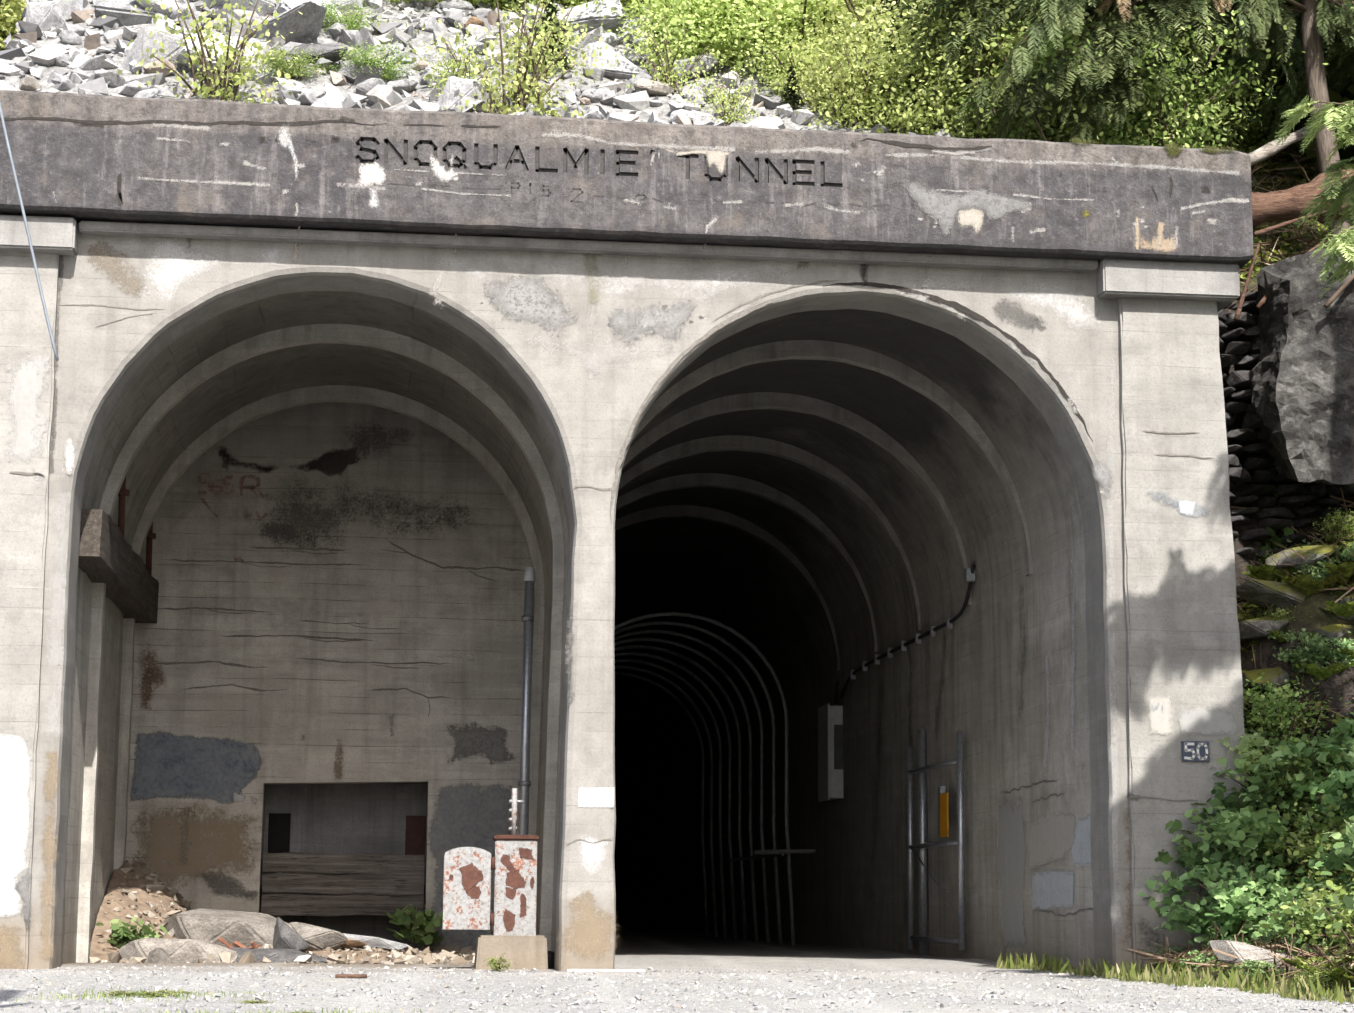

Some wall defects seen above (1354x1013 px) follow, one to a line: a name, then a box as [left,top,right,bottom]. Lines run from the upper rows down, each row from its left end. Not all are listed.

spalling [337,162,386,207]
spalling [901,180,1032,235]
damp [219,446,273,472]
damp [261,425,469,547]
crack [162,538,524,582]
corrosion [142,650,163,709]
crack [156,607,453,718]